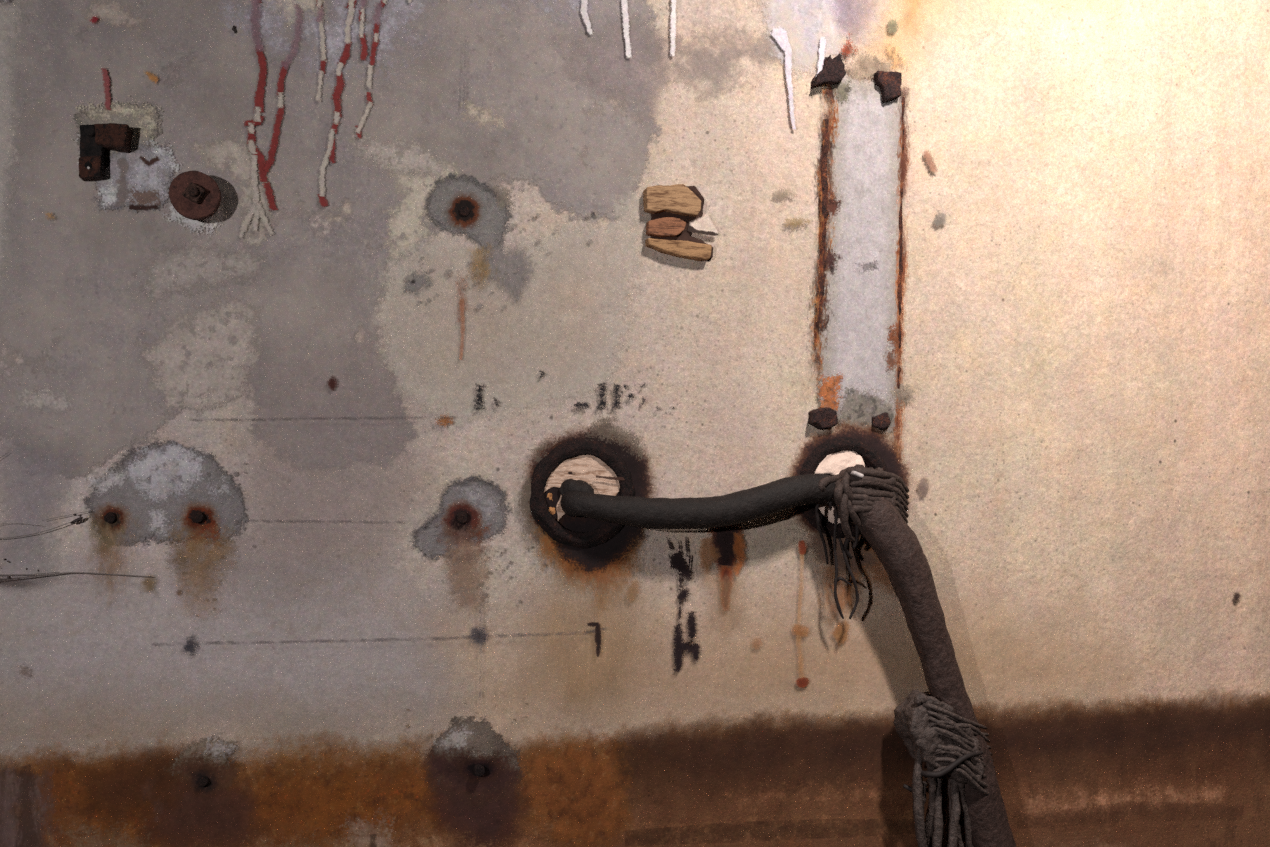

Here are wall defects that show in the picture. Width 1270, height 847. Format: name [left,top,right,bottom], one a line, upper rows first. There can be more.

rust [447,194,481,229]
rust [455,278,465,360]
rust [784,82,910,510]
rust [91,505,126,550]
rust [177,505,231,591]
rust [438,502,488,563]
rust [515,413,655,610]
rust [792,506,893,645]
leakage [0,717,966,847]
leakage [973,697,1270,847]